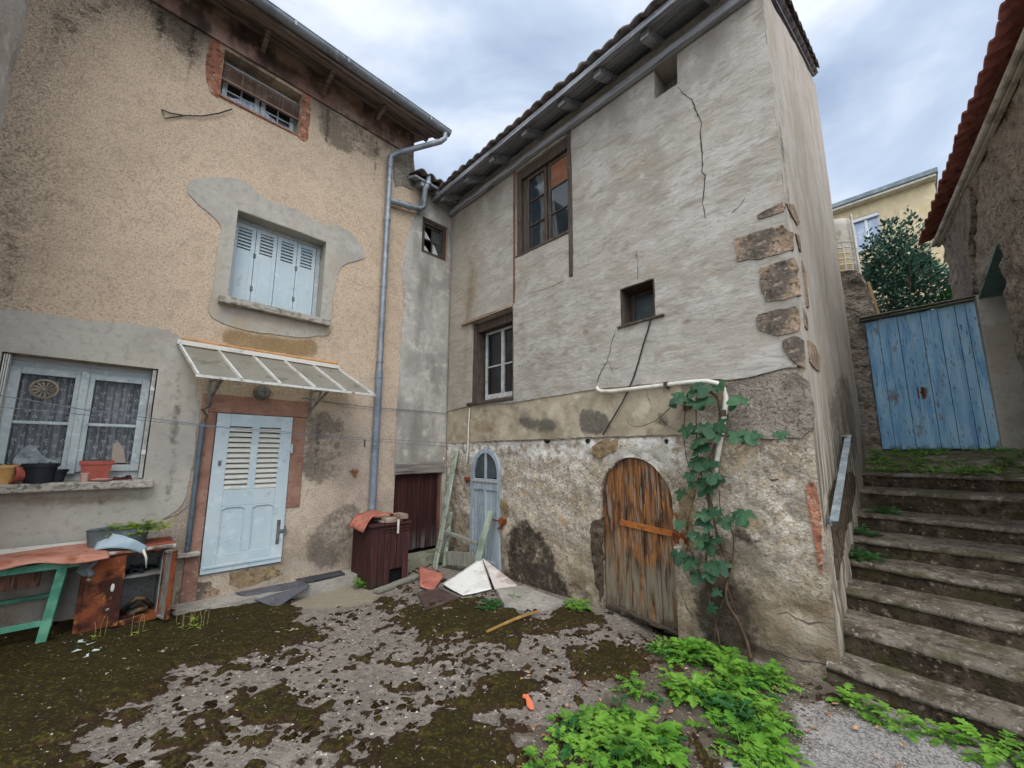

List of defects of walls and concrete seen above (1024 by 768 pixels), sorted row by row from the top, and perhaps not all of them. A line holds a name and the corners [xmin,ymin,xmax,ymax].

crack [677,86,706,218]
leakage [520,418,556,431]
leakage [580,410,609,434]
leakage [507,520,570,598]
flaking render [806,471,856,580]